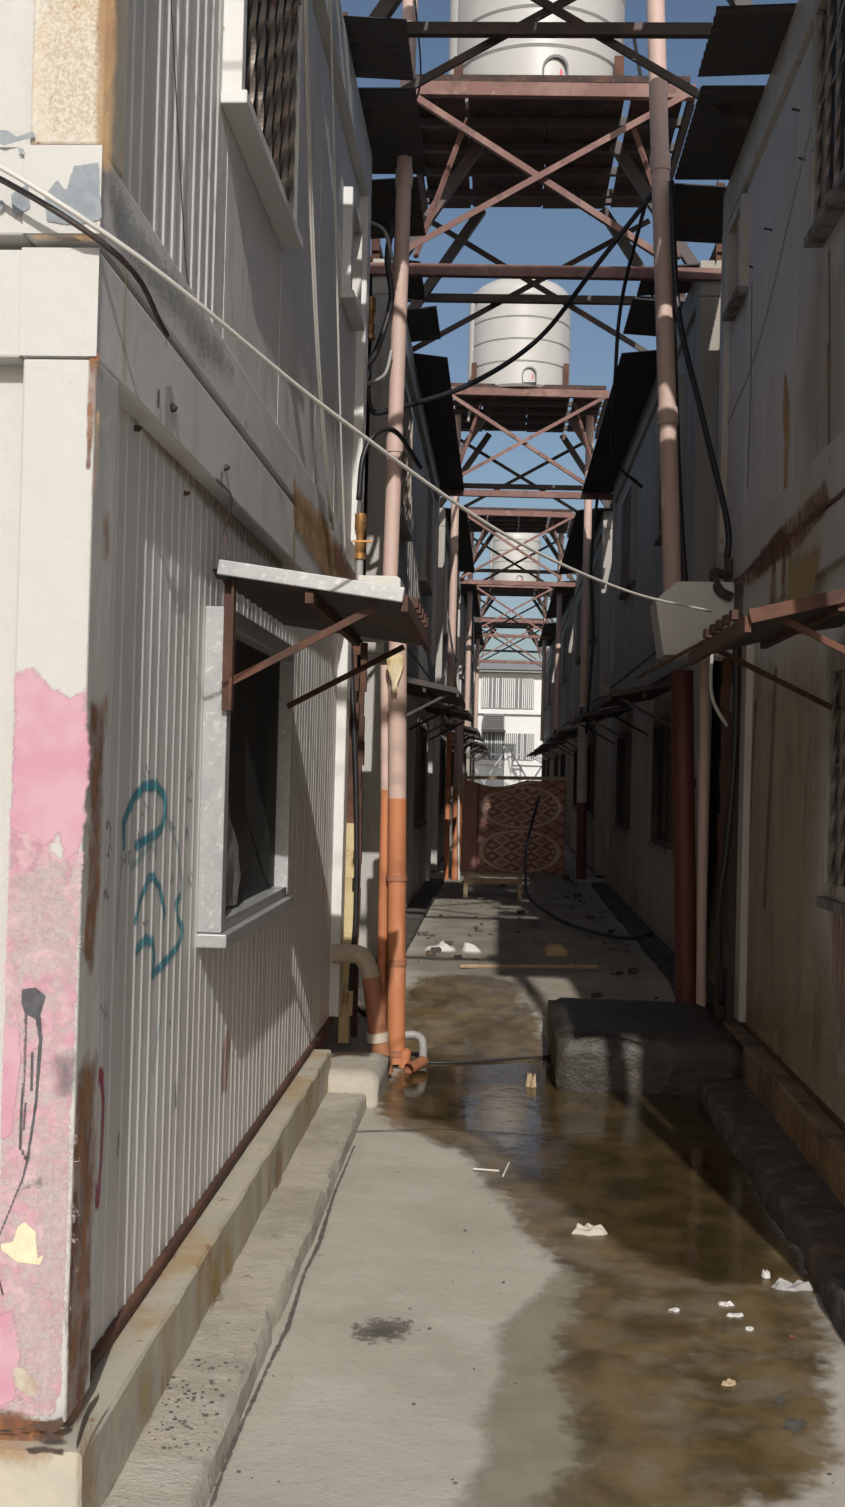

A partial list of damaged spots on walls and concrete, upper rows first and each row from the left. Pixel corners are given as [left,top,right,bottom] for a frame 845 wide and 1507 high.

rust [294,479,356,580]
rust [734,483,845,605]
rust [84,704,106,967]
peeling [0,830,99,1455]
rust [67,1058,97,1417]
leakage [379,974,837,1507]
rust [0,1412,59,1441]